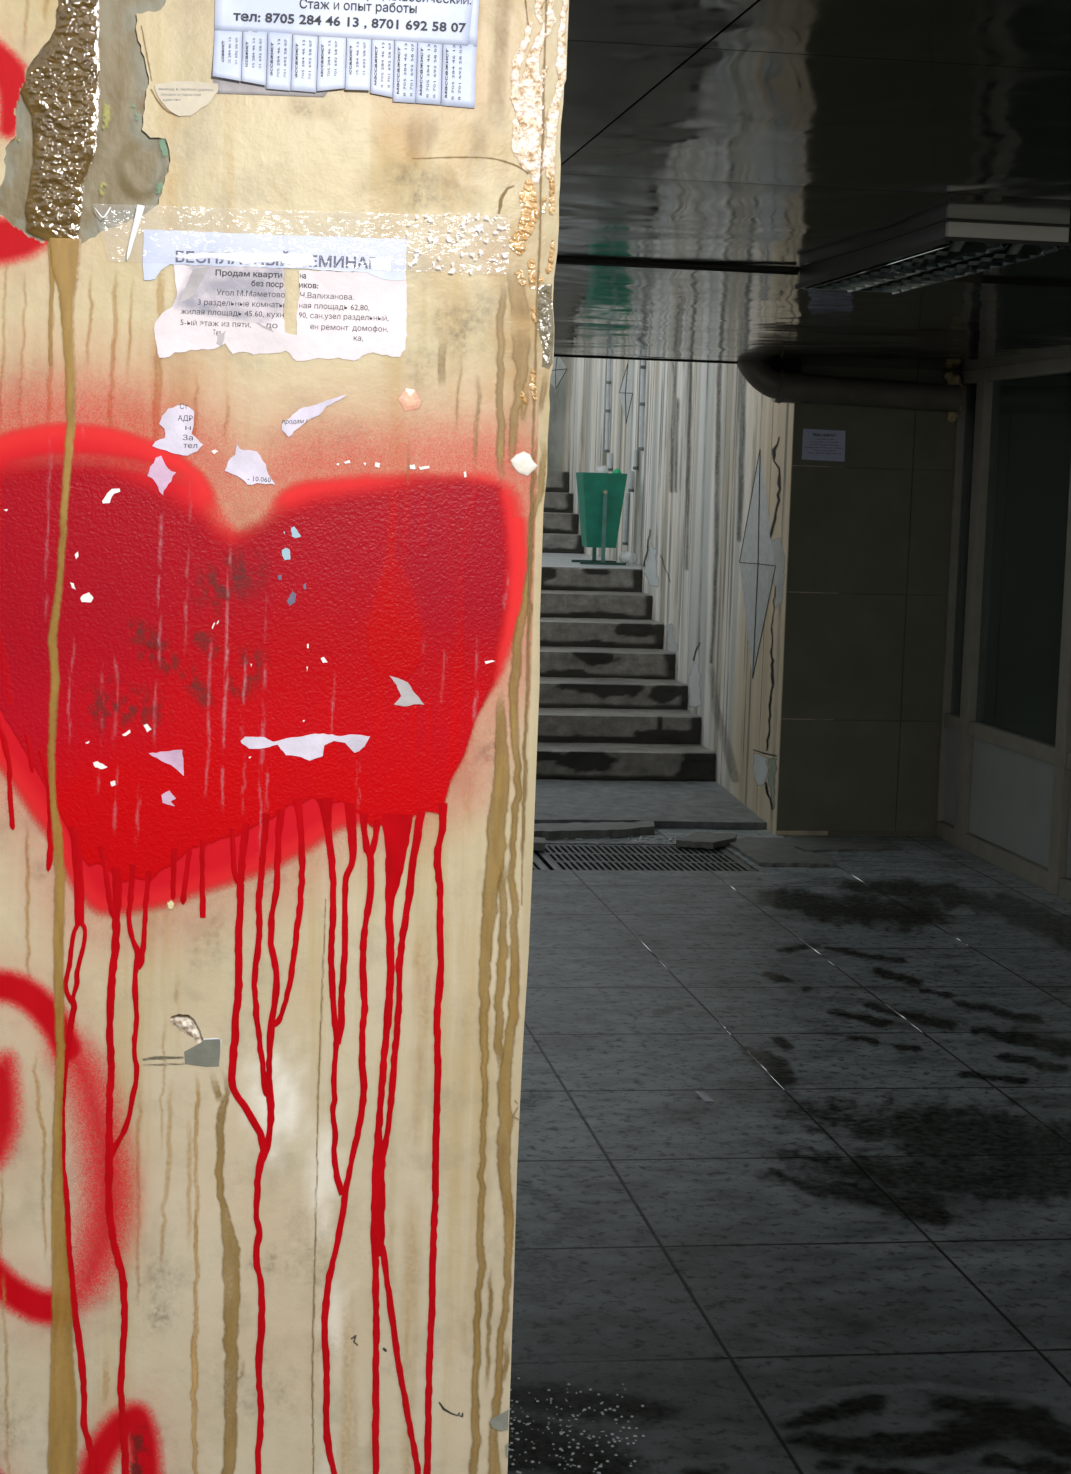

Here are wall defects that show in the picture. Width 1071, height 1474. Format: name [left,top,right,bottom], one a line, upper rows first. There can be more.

peeling [102,488,120,503]
leakage [670,363,692,569]
crack [770,437,781,539]
peeling [70,583,93,602]
crack [754,587,777,810]
leakage [469,454,677,1474]
leakage [741,1037,795,1087]
leakage [759,878,1071,950]
leakage [776,944,1071,1084]
leakage [770,1098,1071,1225]
leakage [786,1385,1071,1474]